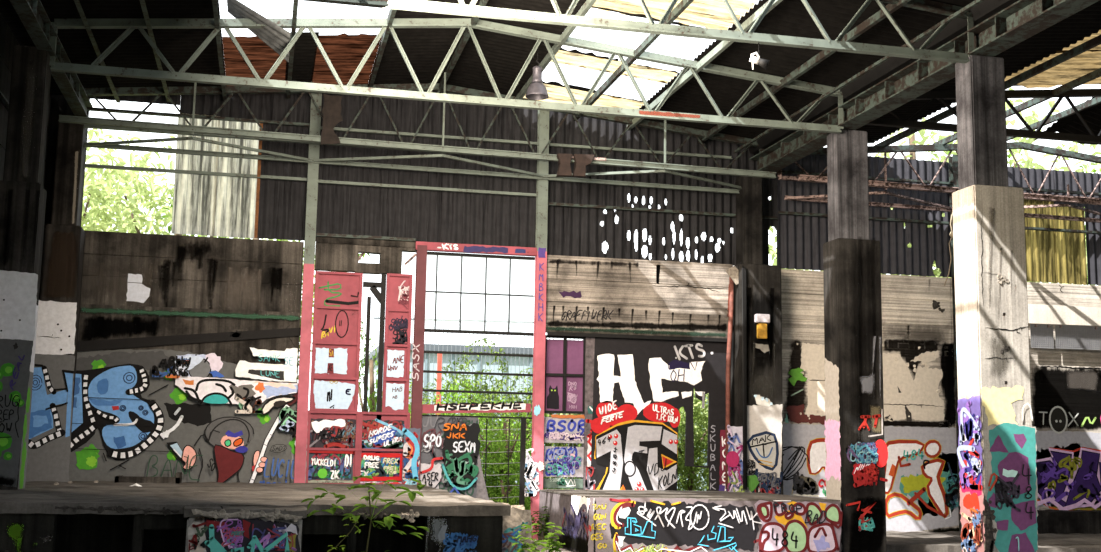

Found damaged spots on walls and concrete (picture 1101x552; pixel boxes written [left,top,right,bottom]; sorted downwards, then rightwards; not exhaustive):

damp [97,243,282,309]
peeling [883,347,945,422]